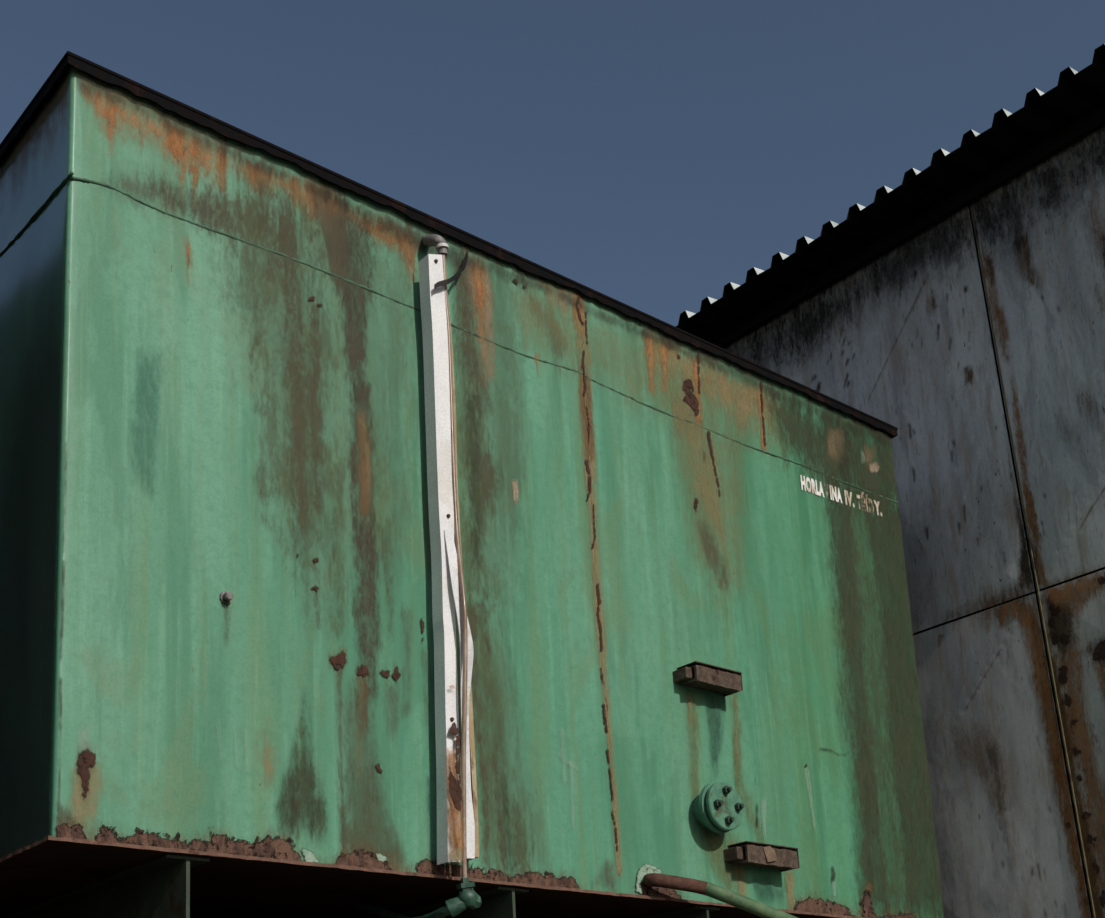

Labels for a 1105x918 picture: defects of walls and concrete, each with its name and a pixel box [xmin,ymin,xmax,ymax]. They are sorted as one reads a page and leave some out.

corrosion [84,86,228,192]
corrosion [240,162,416,278]
damp [727,128,1105,365]
corrosion [645,334,778,577]
corrosion [329,650,401,719]
damp [773,403,944,918]
corrosion [952,390,1105,918]
corrosion [73,748,98,819]
corrosion [448,722,463,861]